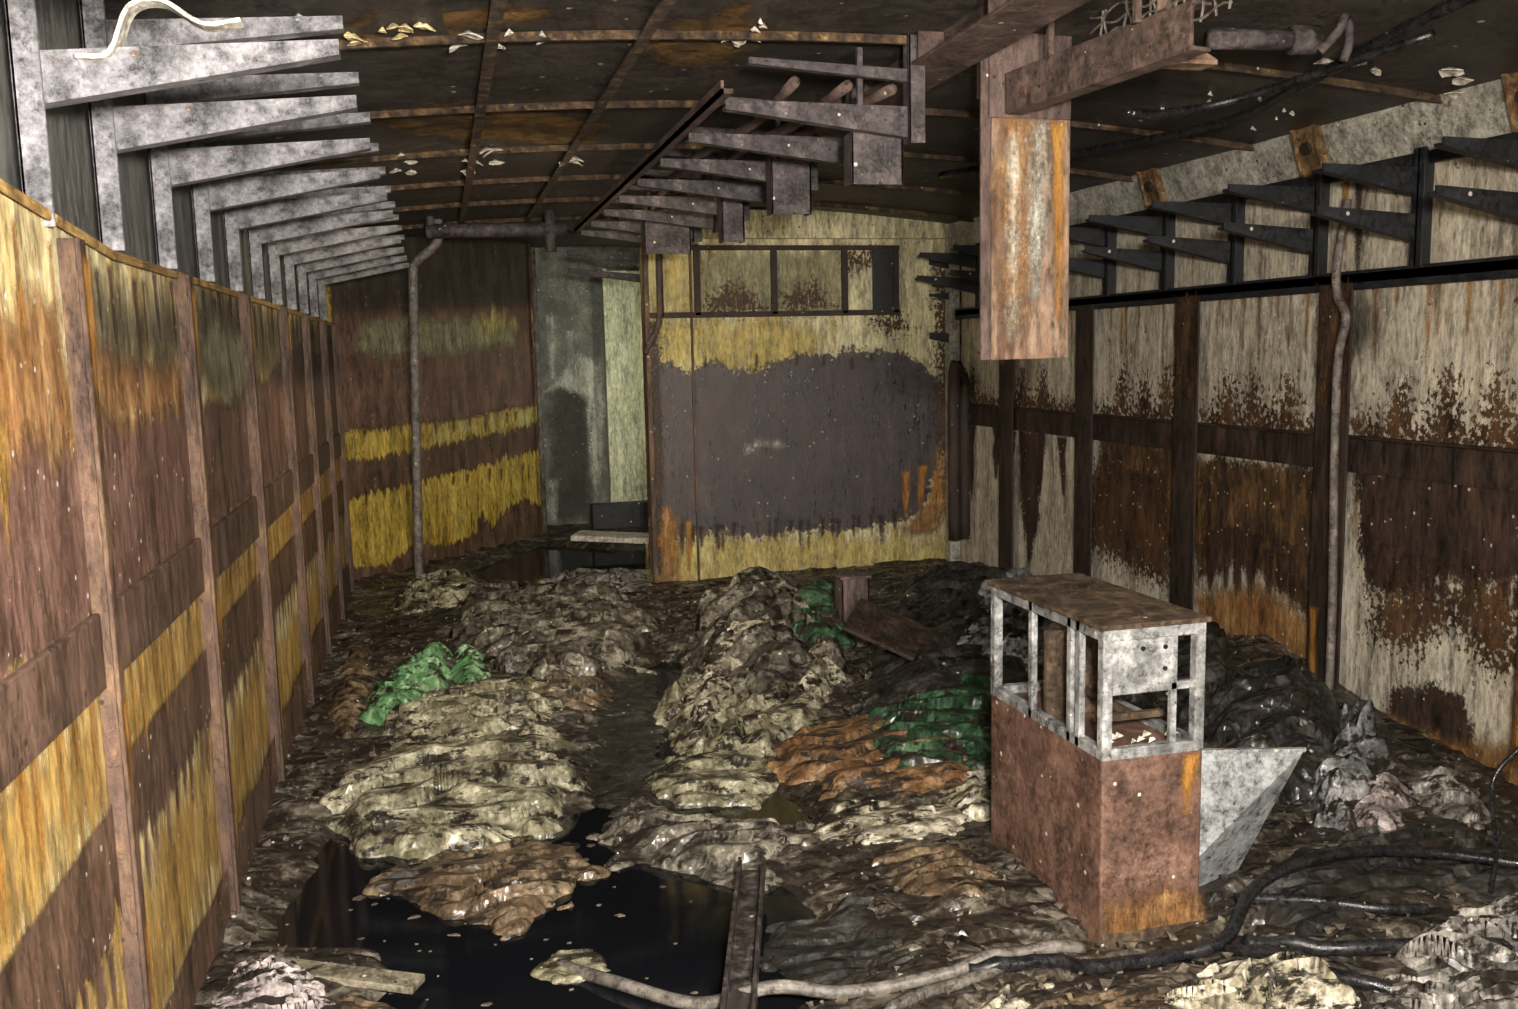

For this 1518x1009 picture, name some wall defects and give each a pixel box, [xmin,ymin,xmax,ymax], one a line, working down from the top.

rust [0,221,92,681]
rust [83,240,536,595]
rust [641,240,946,582]
water stain [645,344,945,555]
rust [970,425,1067,570]
rust [969,361,1075,412]
rust [996,119,1073,346]
rust [1093,228,1518,449]
rust [1342,182,1364,209]
rust [1352,472,1518,786]
rust [1183,755,1197,810]
rust [1104,888,1202,935]